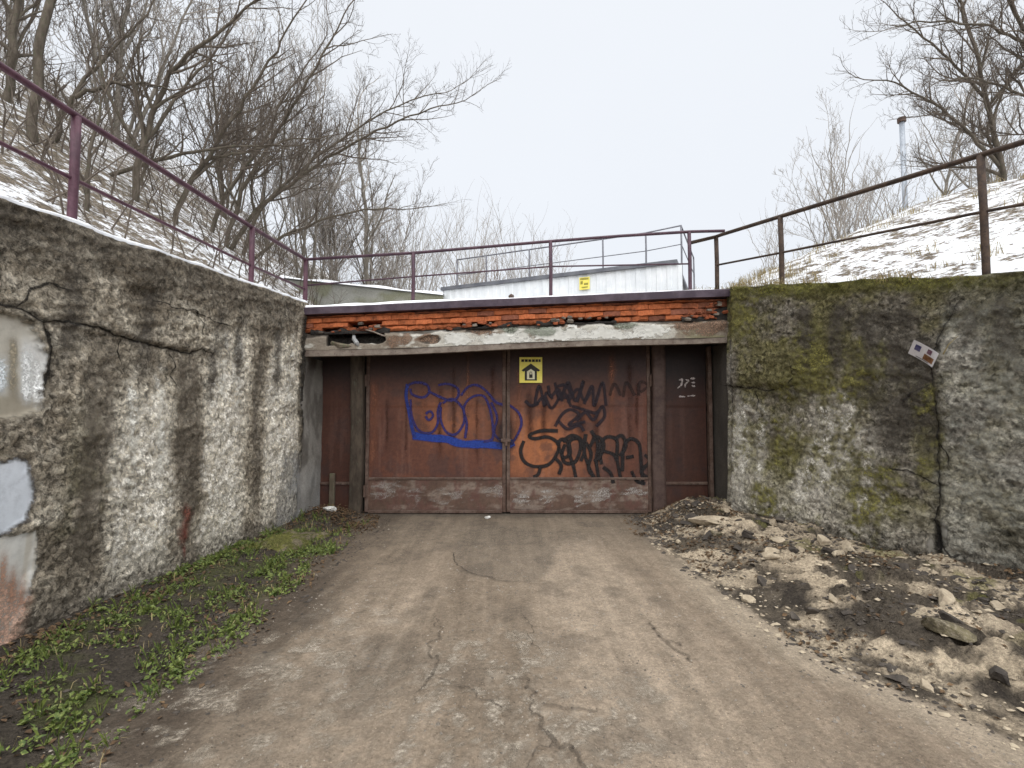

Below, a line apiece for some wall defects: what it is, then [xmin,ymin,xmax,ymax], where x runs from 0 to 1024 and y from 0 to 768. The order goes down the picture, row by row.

flaking render [0,314,47,419]
crack [0,282,230,388]
leakage [75,313,246,565]
spalling [310,322,390,348]
peeling [444,315,672,346]
leakage [731,405,764,488]
leakage [820,306,935,458]
crack [885,299,964,558]
flaking render [0,457,37,644]